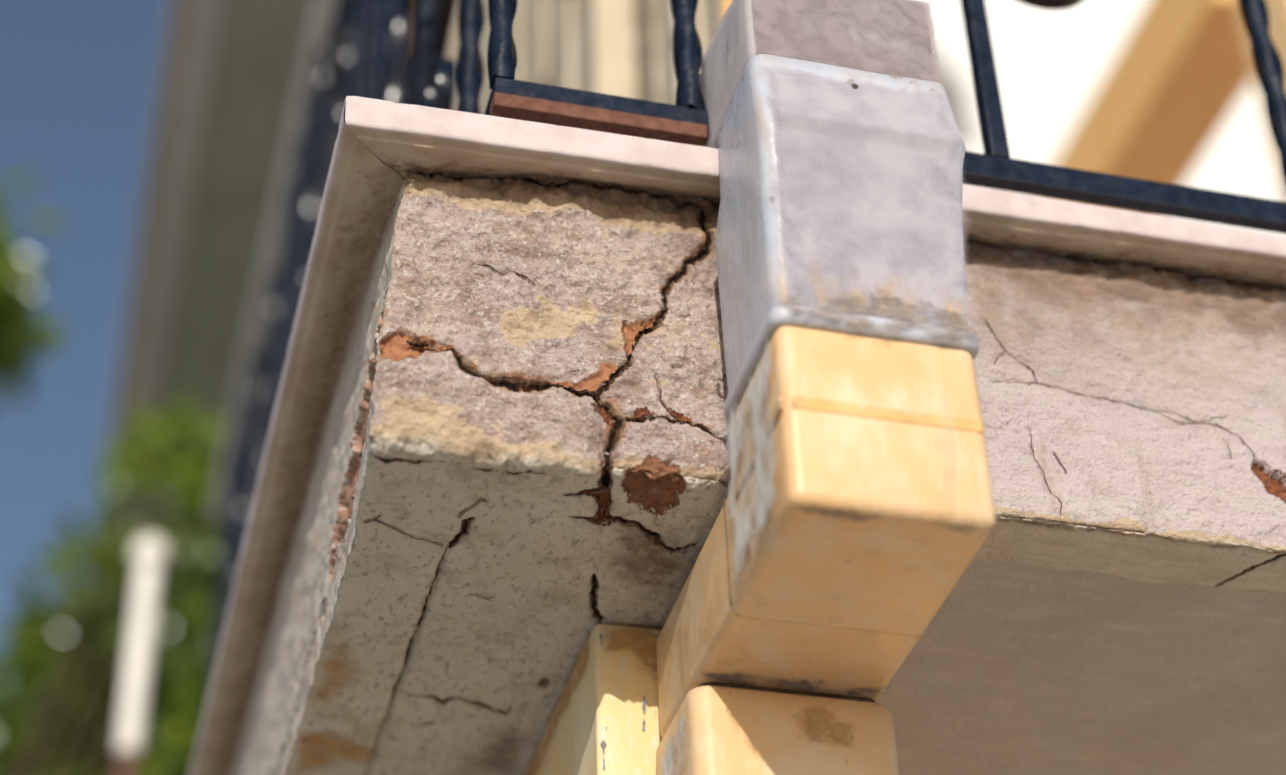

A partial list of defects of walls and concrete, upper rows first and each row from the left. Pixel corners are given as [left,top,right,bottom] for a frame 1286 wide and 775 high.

spalling [328,290,453,581]
crack [364,172,727,774]
spalling [621,454,687,516]
crack [1005,427,1144,533]
crack [984,318,1254,459]
spalling [1251,454,1286,503]
crack [1215,553,1286,587]